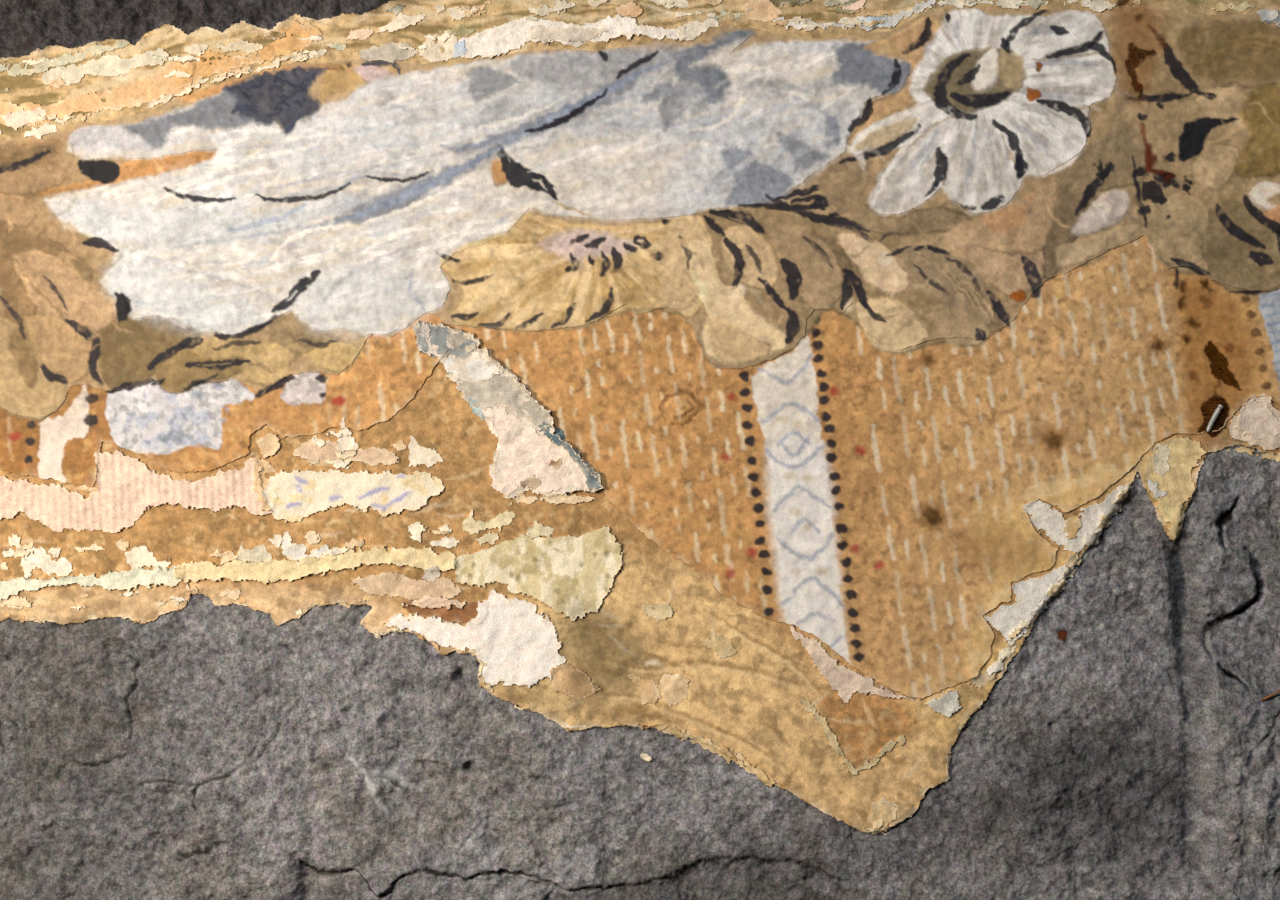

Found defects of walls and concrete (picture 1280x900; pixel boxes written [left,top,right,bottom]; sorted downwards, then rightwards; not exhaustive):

peeling [0,0,1141,140]
peeling [1201,0,1280,27]
peeling [0,320,623,700]
crack [1203,507,1262,639]
crack [1222,669,1244,684]
crack [364,869,529,897]